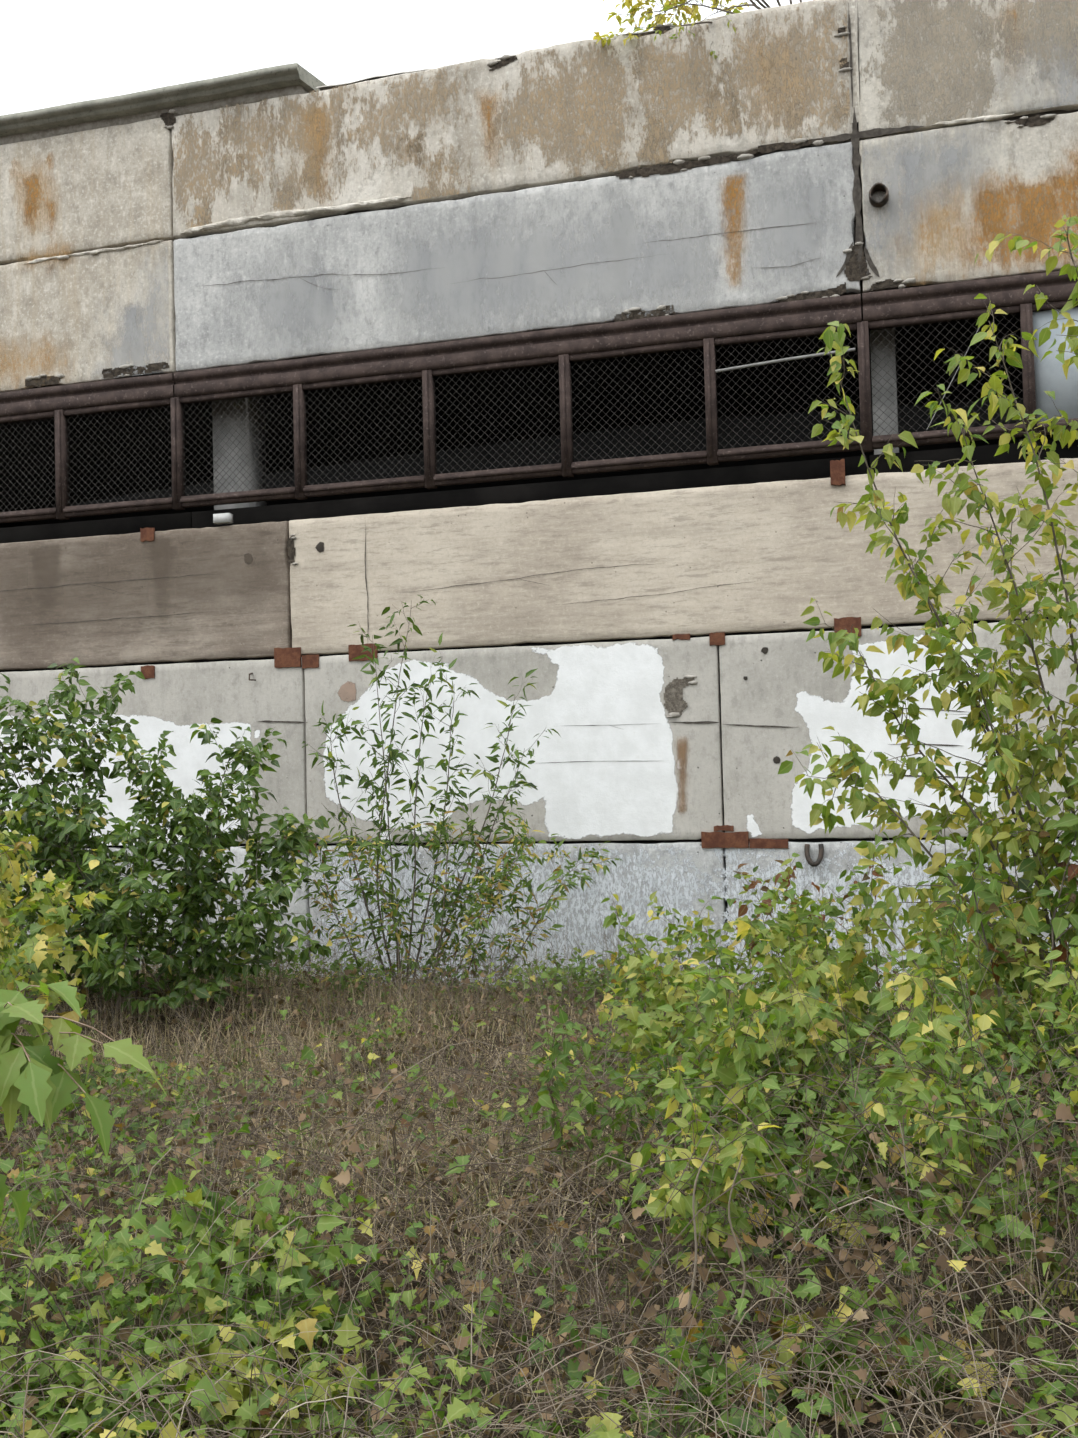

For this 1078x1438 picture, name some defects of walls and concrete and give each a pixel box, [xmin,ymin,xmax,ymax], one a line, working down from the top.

rust [23,155,54,227]
rust [724,177,742,283]
rust [918,150,1078,267]
spalling [664,675,698,718]
rust [678,740,686,811]